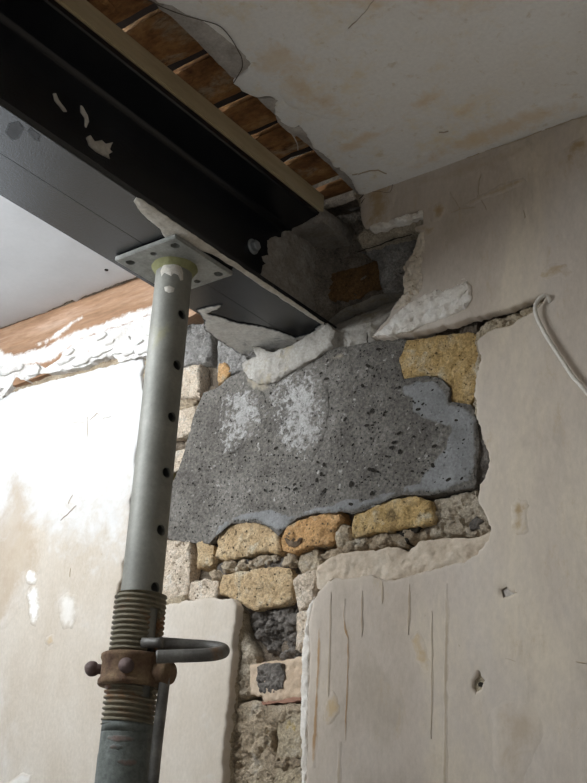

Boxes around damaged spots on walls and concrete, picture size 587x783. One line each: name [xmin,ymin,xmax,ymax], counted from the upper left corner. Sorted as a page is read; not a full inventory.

spalling [151,0,251,78]
spalling [257,96,543,416]
flaking render [0,315,151,400]
spalling [173,319,256,481]
damp [0,467,45,630]
spalling [162,426,491,783]